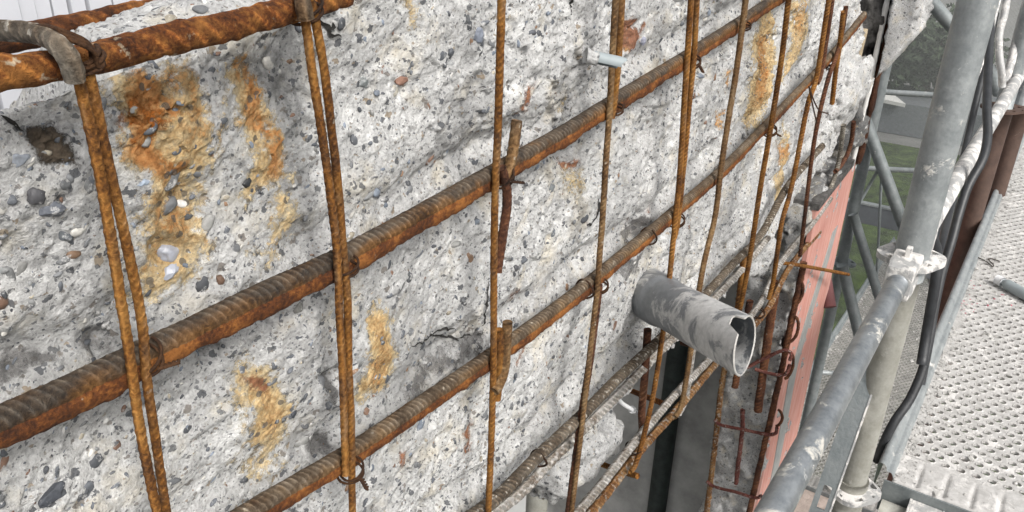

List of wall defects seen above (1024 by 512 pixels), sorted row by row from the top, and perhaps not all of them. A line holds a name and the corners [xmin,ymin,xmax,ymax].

spalling [593,0,631,57]
rust [623,19,646,51]
rust [741,0,810,129]
spalling [156,170,243,263]
rust [101,54,300,304]
spalling [0,226,44,325]
spalling [0,326,54,388]
rust [354,300,399,405]
crack [412,286,489,347]
spalling [60,480,106,512]
spalling [87,445,104,468]
rust [228,360,295,482]